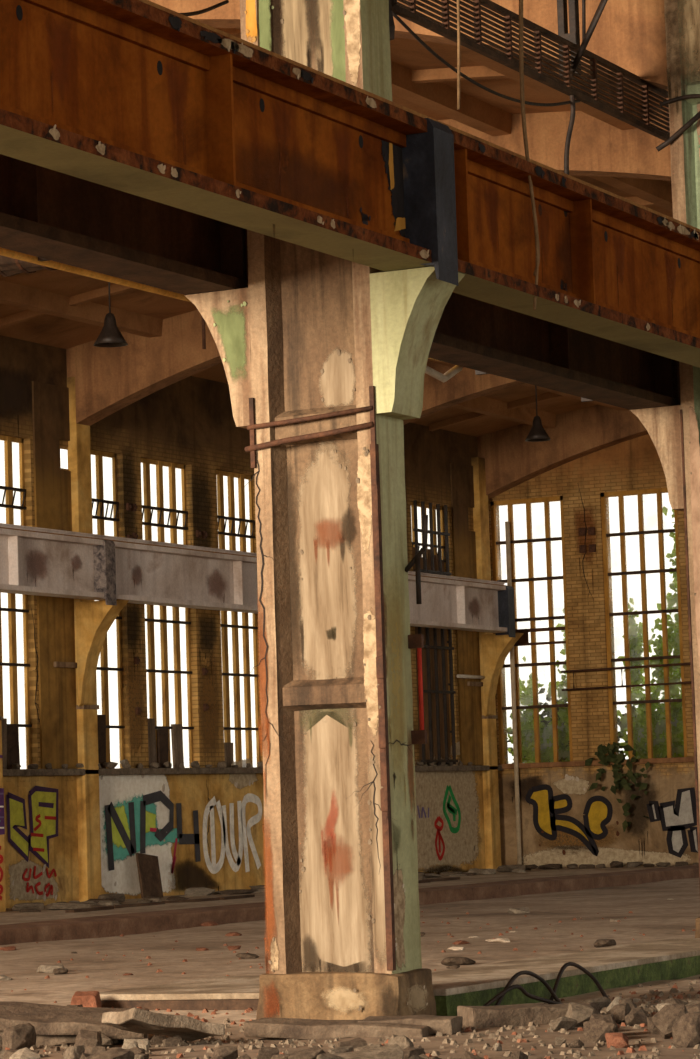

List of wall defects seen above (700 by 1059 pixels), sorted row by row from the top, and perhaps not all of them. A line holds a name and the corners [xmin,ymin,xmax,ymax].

peeling [212,300,247,378]
peeling [319,348,356,407]
peeling [328,988,364,1011]